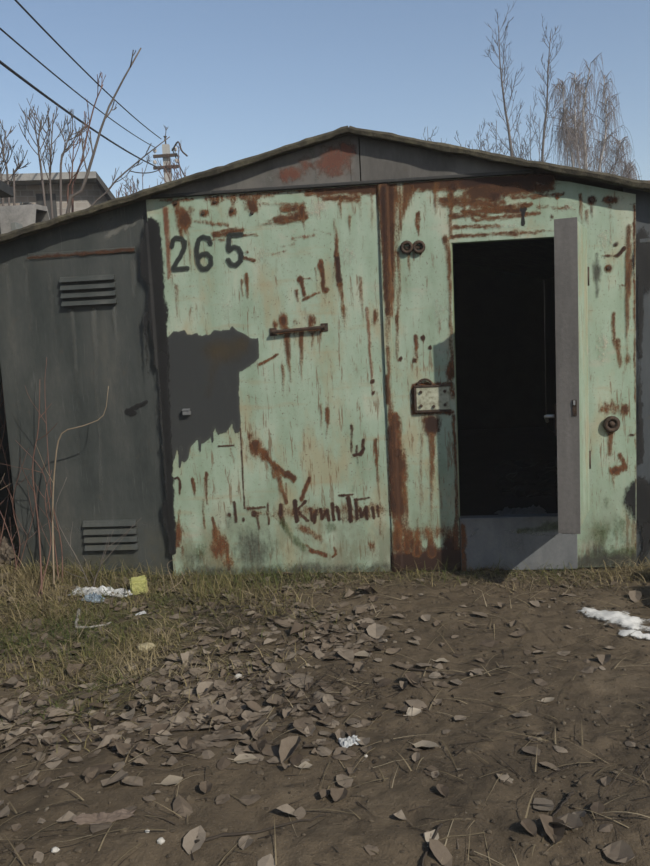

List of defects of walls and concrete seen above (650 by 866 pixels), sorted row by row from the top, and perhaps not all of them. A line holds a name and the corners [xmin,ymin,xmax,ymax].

corrosion [160,173,618,572]
corrosion [600,203,636,483]